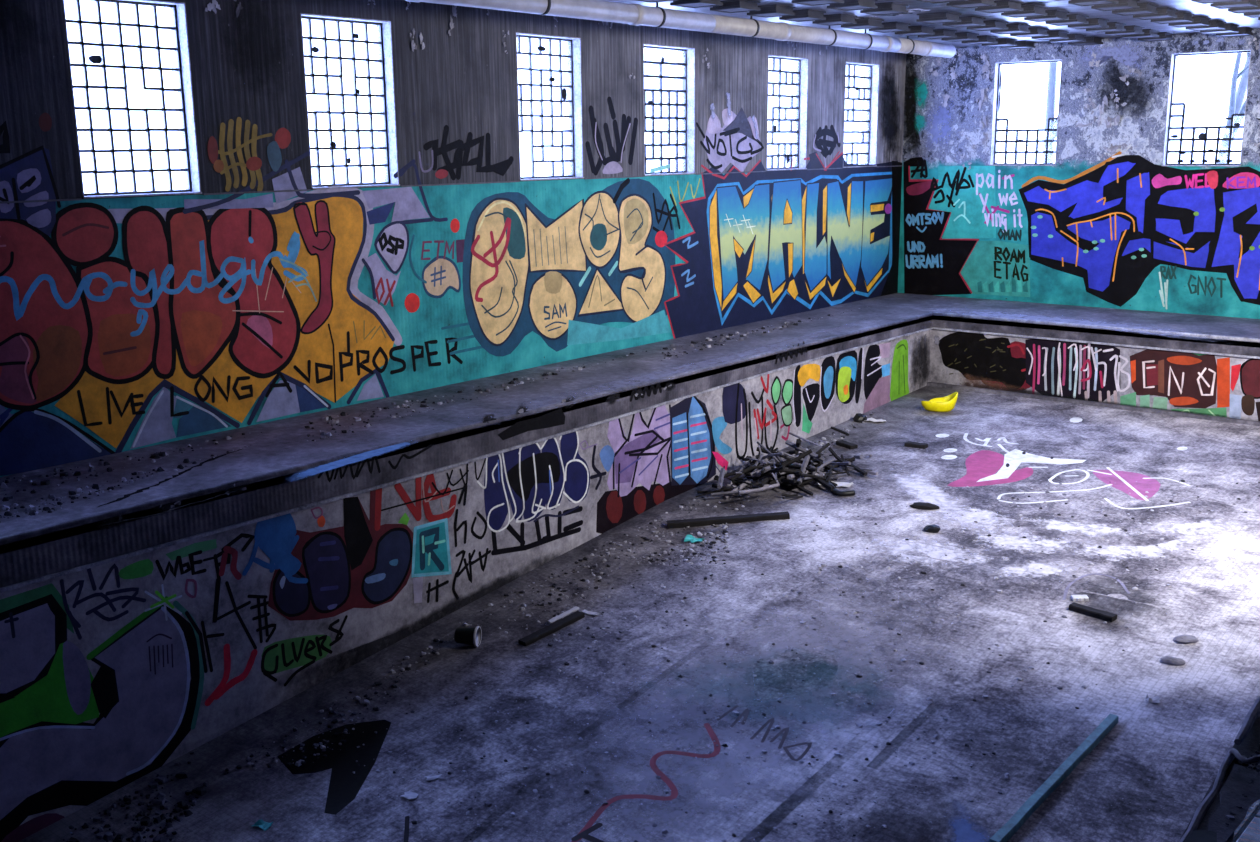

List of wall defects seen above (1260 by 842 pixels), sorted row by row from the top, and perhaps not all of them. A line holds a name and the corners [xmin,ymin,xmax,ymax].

damp [1081,43,1142,68]
damp [882,57,951,153]